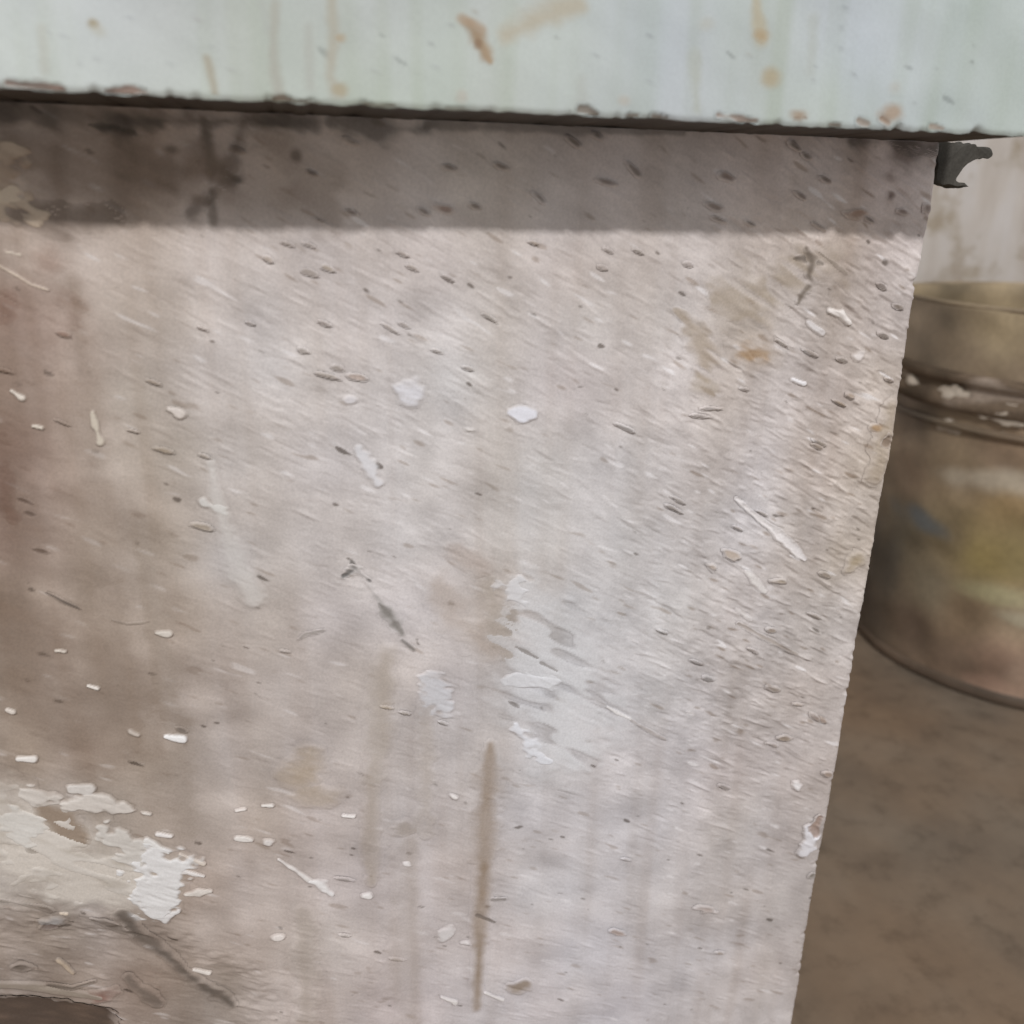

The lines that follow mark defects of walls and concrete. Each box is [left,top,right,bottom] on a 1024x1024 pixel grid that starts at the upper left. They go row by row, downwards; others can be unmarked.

rust [452,0,594,67]
leakage [683,12,719,120]
peeling [9,388,28,402]
peeling [165,406,189,420]
peeling [505,403,539,424]
leakage [0,68,688,851]
peeling [379,558,668,805]
peeling [0,754,214,931]
peeling [233,835,276,847]
spalling [794,813,825,859]
spalling [0,960,124,1024]
peeling [191,967,213,975]